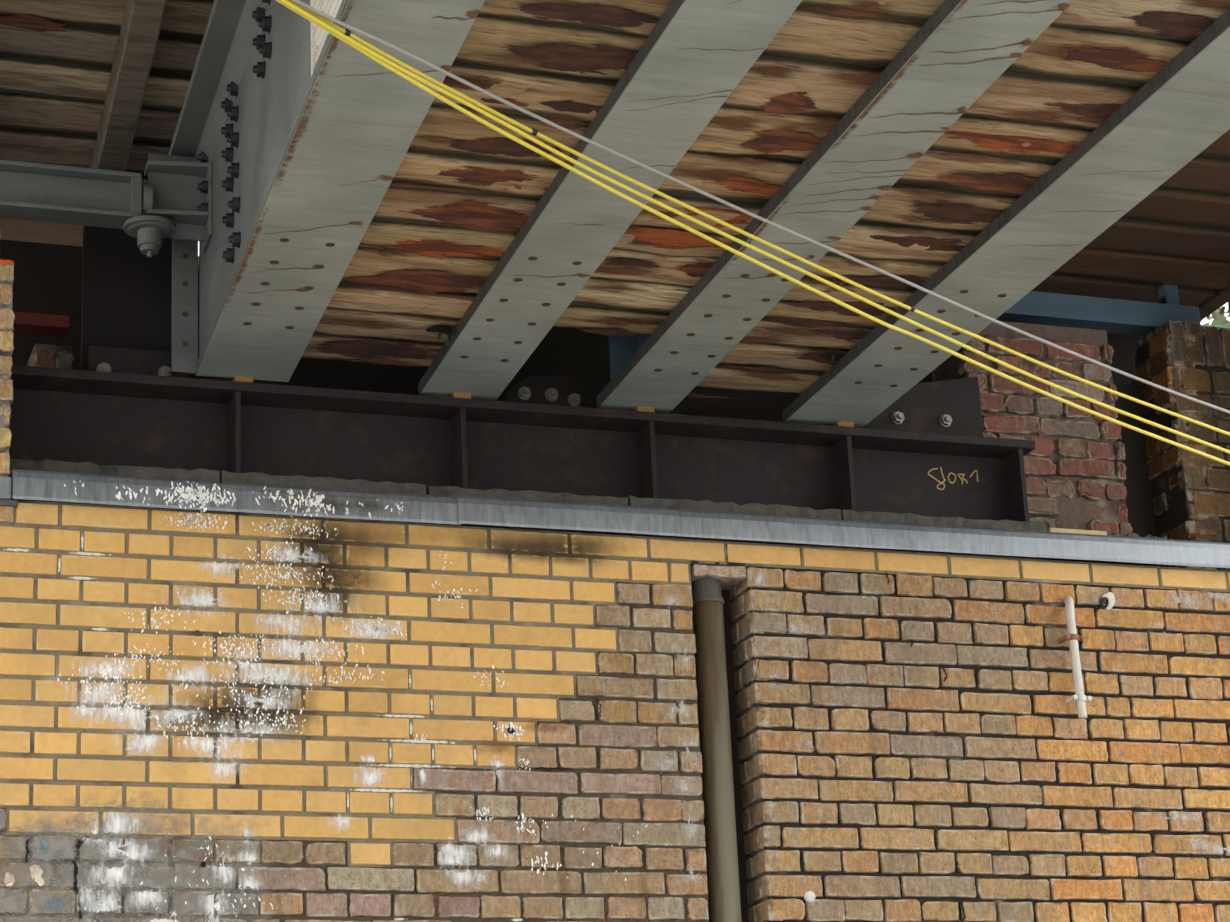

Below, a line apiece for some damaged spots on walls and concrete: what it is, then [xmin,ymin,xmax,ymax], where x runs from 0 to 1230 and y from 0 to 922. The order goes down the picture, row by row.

rust [319,5,348,75]
rust [277,91,318,180]
rust [228,220,262,297]
damp [57,481,407,777]
damp [336,699,457,829]
damp [493,722,524,741]
damp [81,813,278,922]
damp [440,807,504,883]
damp [514,813,553,835]
damp [531,852,568,878]